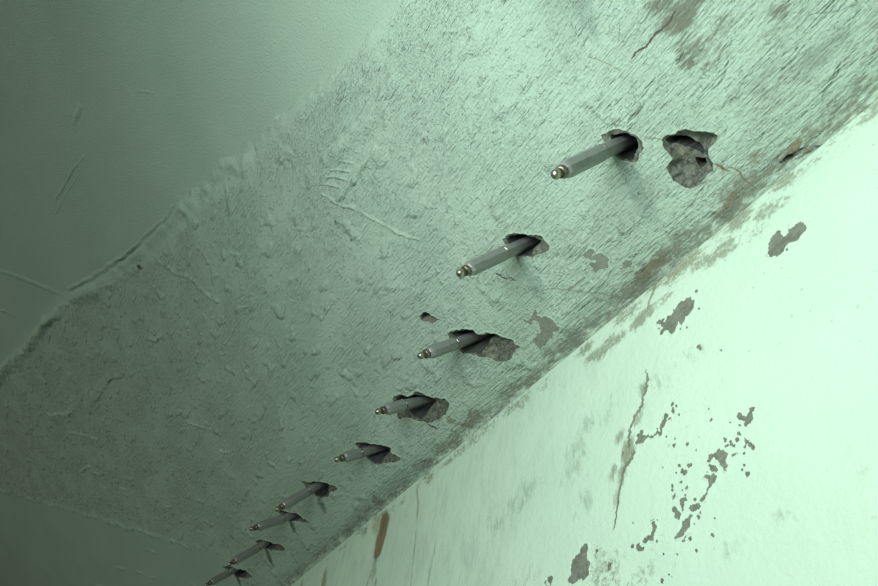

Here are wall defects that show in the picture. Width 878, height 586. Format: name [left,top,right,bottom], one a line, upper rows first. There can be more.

crack [589,11,675,70]
leakage [790,75,878,154]
spalling [660,127,720,191]
peeling [766,220,810,260]
spalling [447,308,562,364]
leakage [421,155,796,483]
peeling [655,290,700,337]
spalling [391,389,451,425]
crack [613,369,649,529]
peeling [634,402,696,451]
peeling [671,407,755,552]
peeling [567,542,598,586]